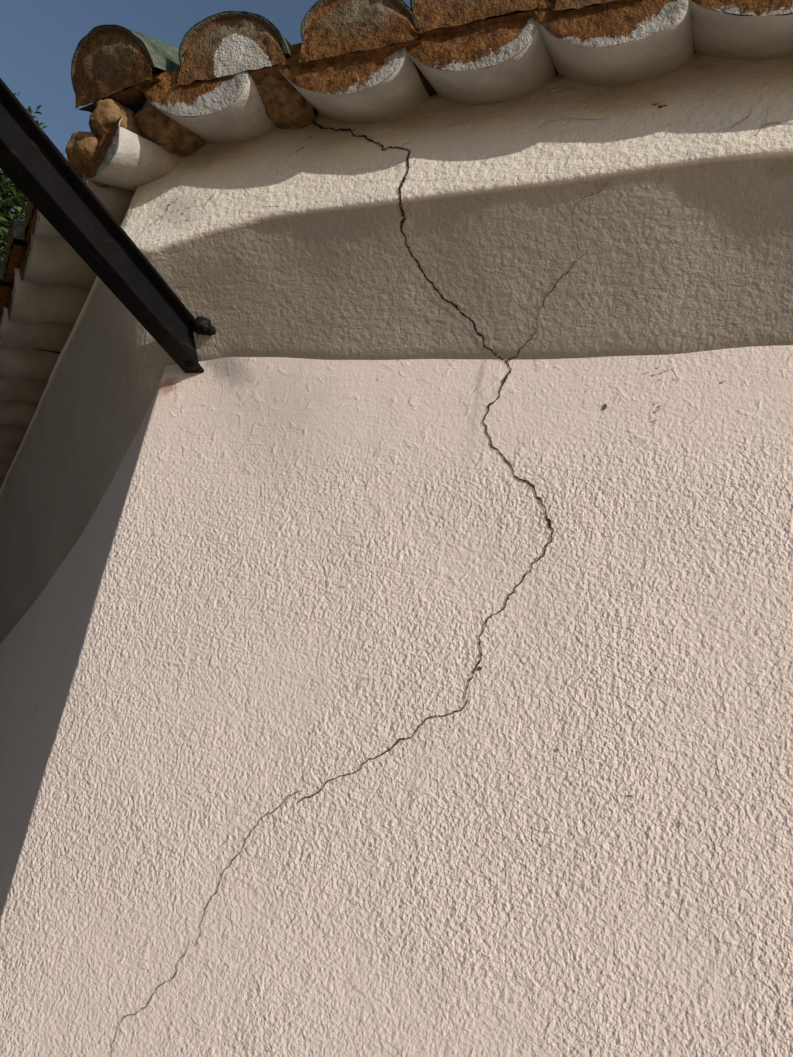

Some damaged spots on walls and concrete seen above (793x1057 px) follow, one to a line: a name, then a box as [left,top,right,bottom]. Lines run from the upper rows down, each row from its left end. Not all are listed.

crack [728,103,793,136]
crack [111,121,607,1057]